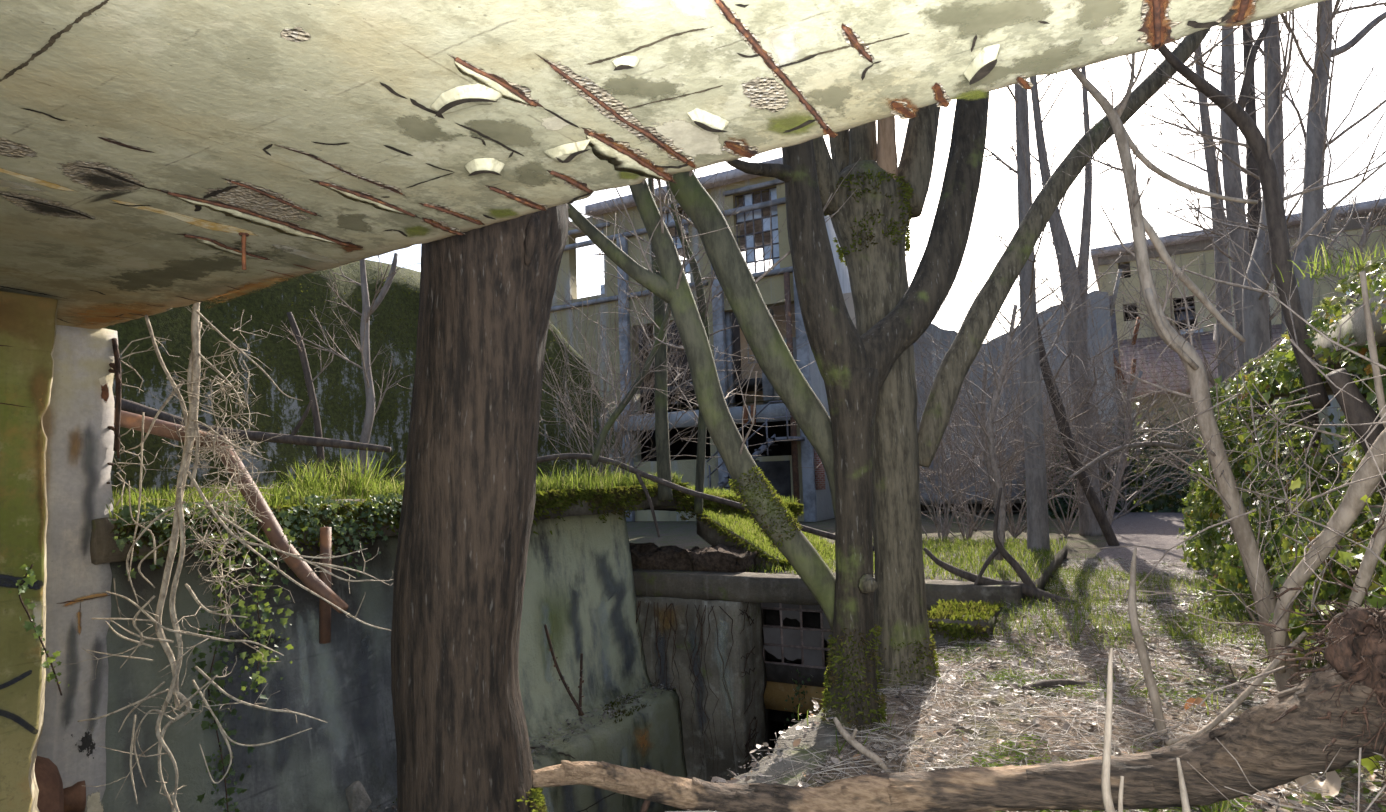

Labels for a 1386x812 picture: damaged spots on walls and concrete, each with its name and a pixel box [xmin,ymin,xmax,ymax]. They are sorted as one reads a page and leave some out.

crack [0,0,109,82]
crack [794,33,909,62]
crack [21,108,66,121]
crack [380,82,525,158]
crack [616,85,723,112]
crack [384,145,453,188]
leakage [598,556,635,676]